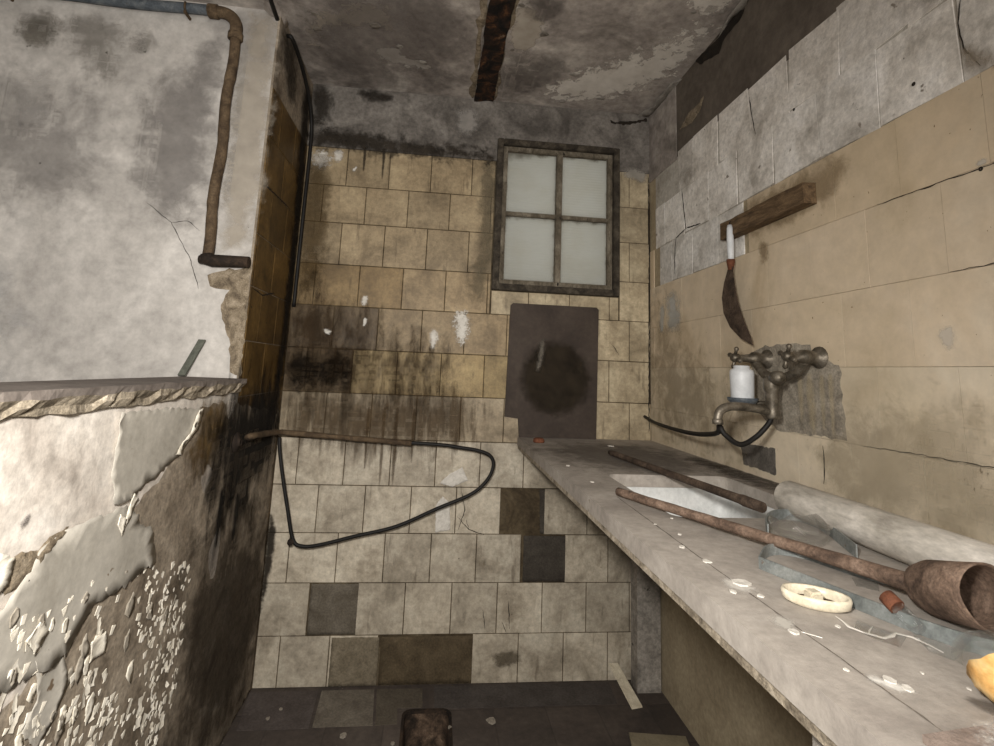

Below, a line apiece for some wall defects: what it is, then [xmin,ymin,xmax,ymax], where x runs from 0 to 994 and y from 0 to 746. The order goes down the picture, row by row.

peeling [543,0,747,129]
crack [877,163,994,205]
crack [147,203,198,285]
flaking render [208,267,253,376]
peeling [751,343,847,441]
crack [863,446,994,468]
peeling [0,401,279,746]
water stain [183,490,262,746]
peeling [307,583,473,687]